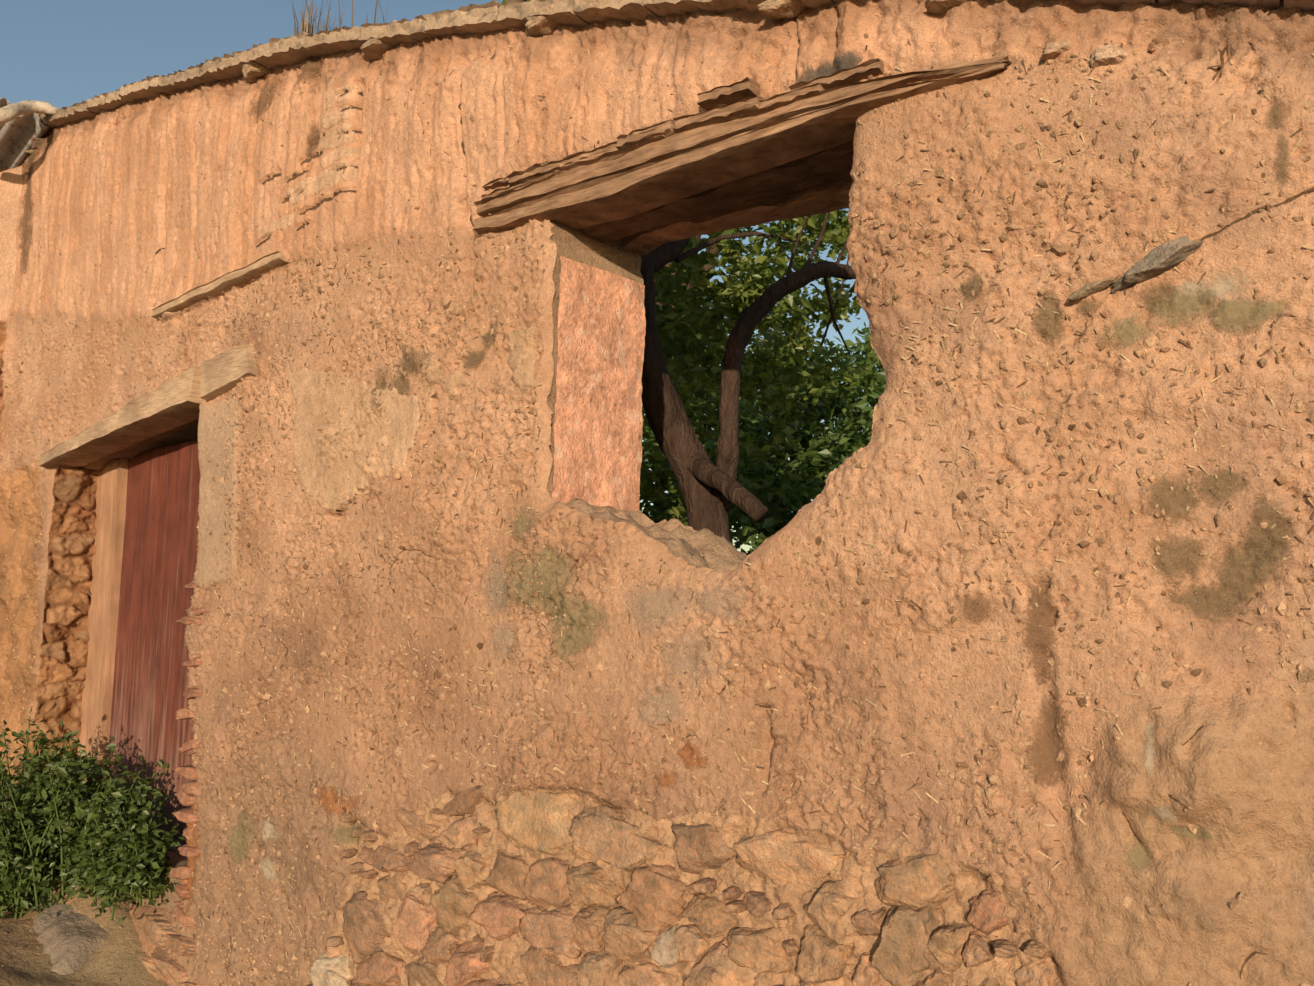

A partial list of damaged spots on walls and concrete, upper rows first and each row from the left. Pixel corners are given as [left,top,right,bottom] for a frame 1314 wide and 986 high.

crack [1200,187,1314,241]
water stain [1026,580,1057,683]
water stain [1030,699,1066,785]